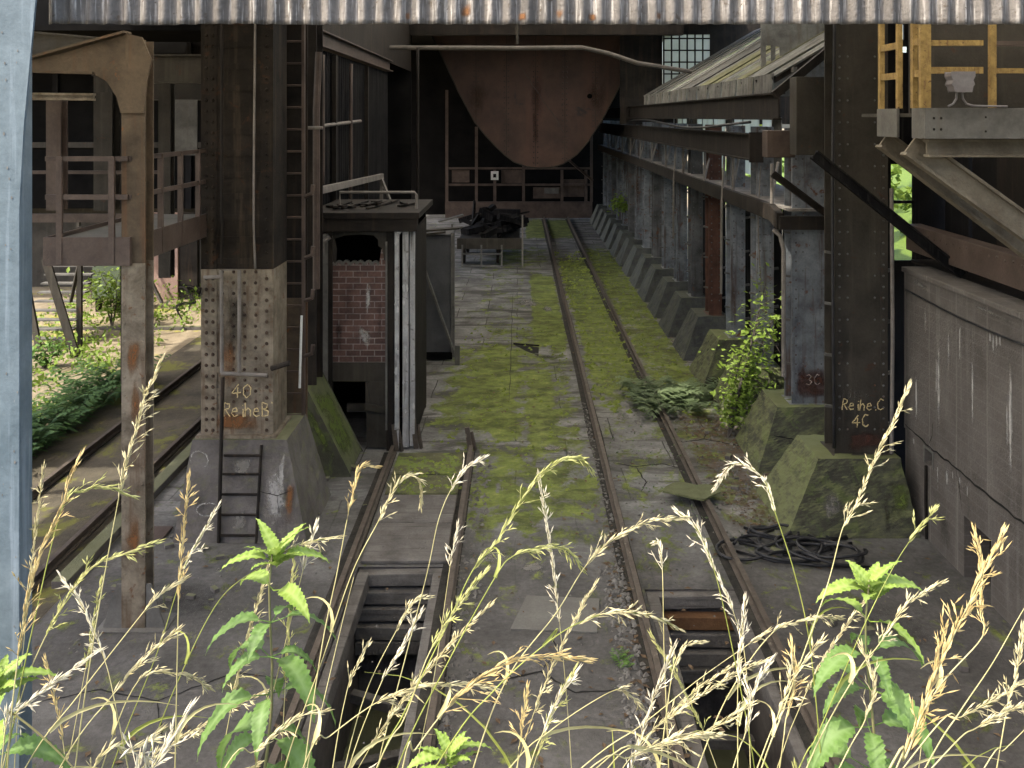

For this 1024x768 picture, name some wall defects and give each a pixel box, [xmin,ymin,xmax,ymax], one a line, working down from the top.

corrosion [797,369,824,396]
damp [936,327,961,406]
crack [905,424,1024,524]
corrosion [127,523,139,550]